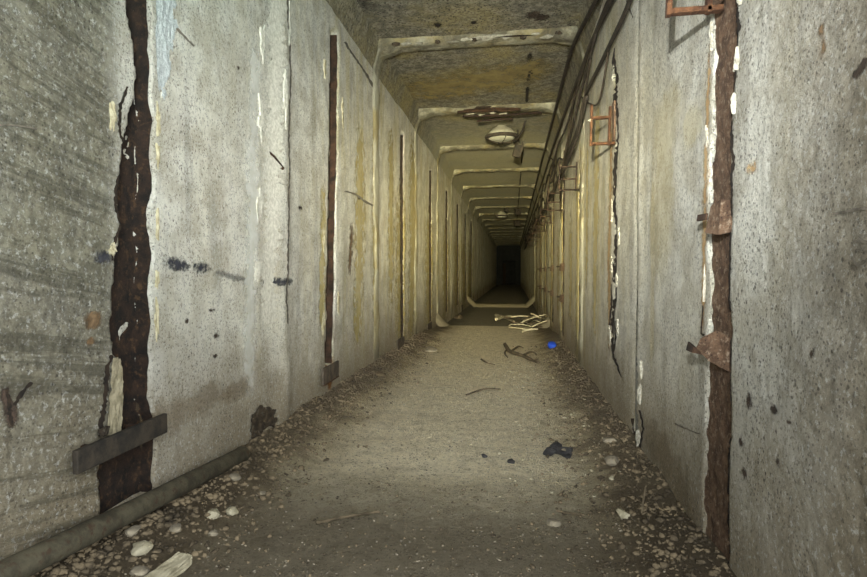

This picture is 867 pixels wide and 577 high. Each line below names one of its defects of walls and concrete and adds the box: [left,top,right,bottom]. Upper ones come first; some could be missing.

spalling [98,0,179,436]
crack [607,48,621,376]
spalling [97,439,153,514]